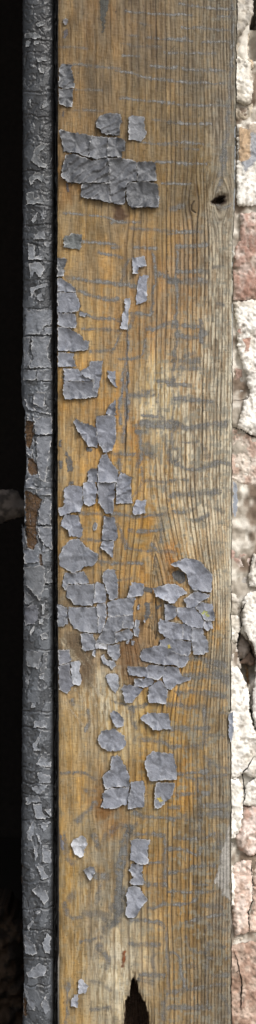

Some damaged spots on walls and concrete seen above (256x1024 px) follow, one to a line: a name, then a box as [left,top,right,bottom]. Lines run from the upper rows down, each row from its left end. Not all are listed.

peeling [24,22,45,47]
peeling [29,64,75,108]
peeling [59,113,160,209]
peeling [22,143,215,809]
peeling [23,720,52,1016]
peeling [71,836,95,880]
peeling [125,838,150,918]